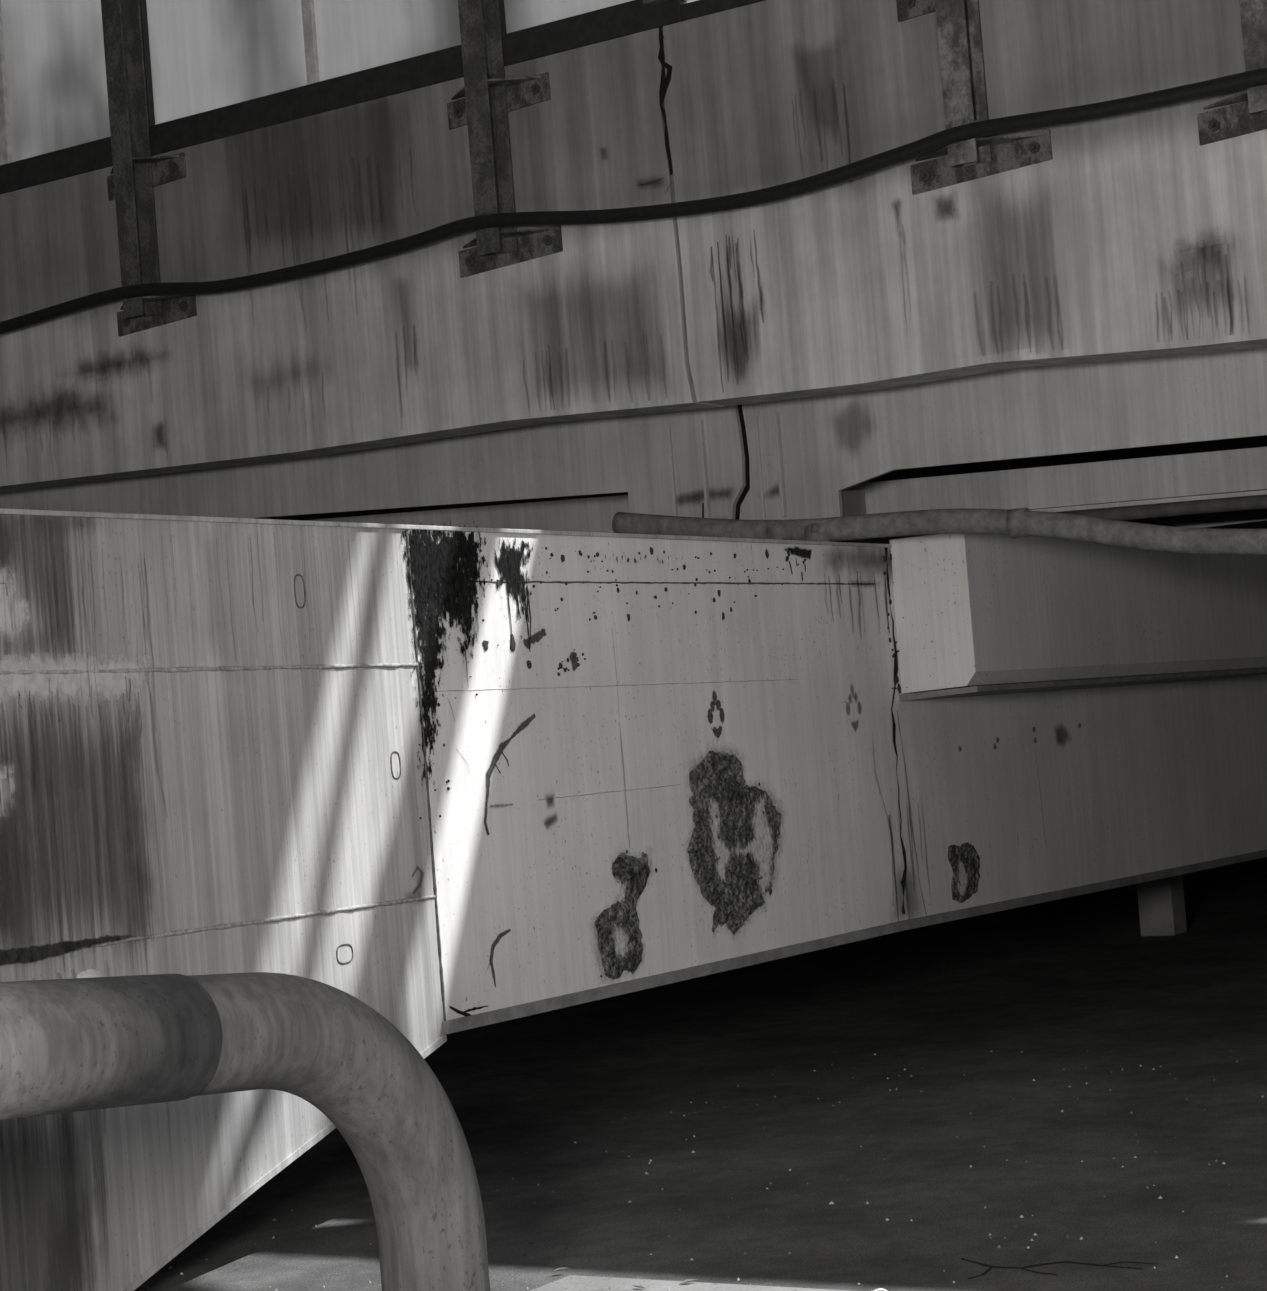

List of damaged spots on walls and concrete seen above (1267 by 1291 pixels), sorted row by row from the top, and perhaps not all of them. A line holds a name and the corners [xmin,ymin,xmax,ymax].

crack [643,28,673,193]
leakage [0,516,149,942]
spalling [595,850,657,980]
spalling [687,691,781,935]
spalling [948,842,980,903]
crack [960,1258,1158,1279]